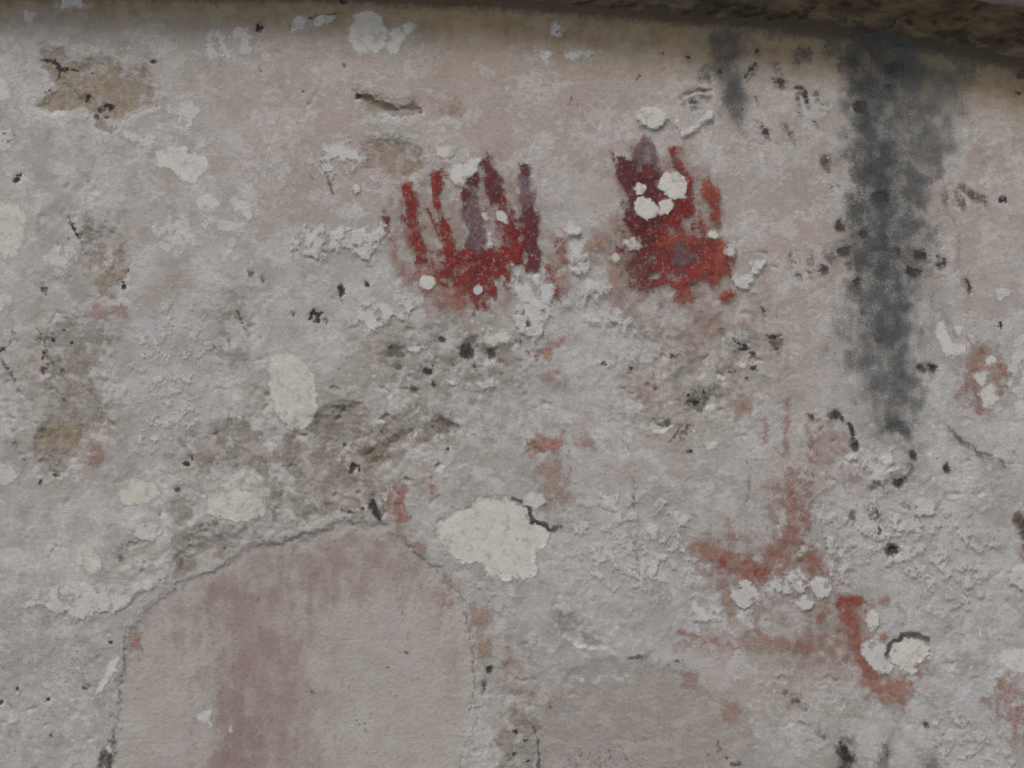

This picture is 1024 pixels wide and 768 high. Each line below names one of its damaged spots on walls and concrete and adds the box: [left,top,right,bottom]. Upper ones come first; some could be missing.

spalling [40,47,165,143]
spalling [351,85,436,193]
leakage [679,31,759,125]
leakage [789,19,1012,487]
spalling [101,403,562,768]